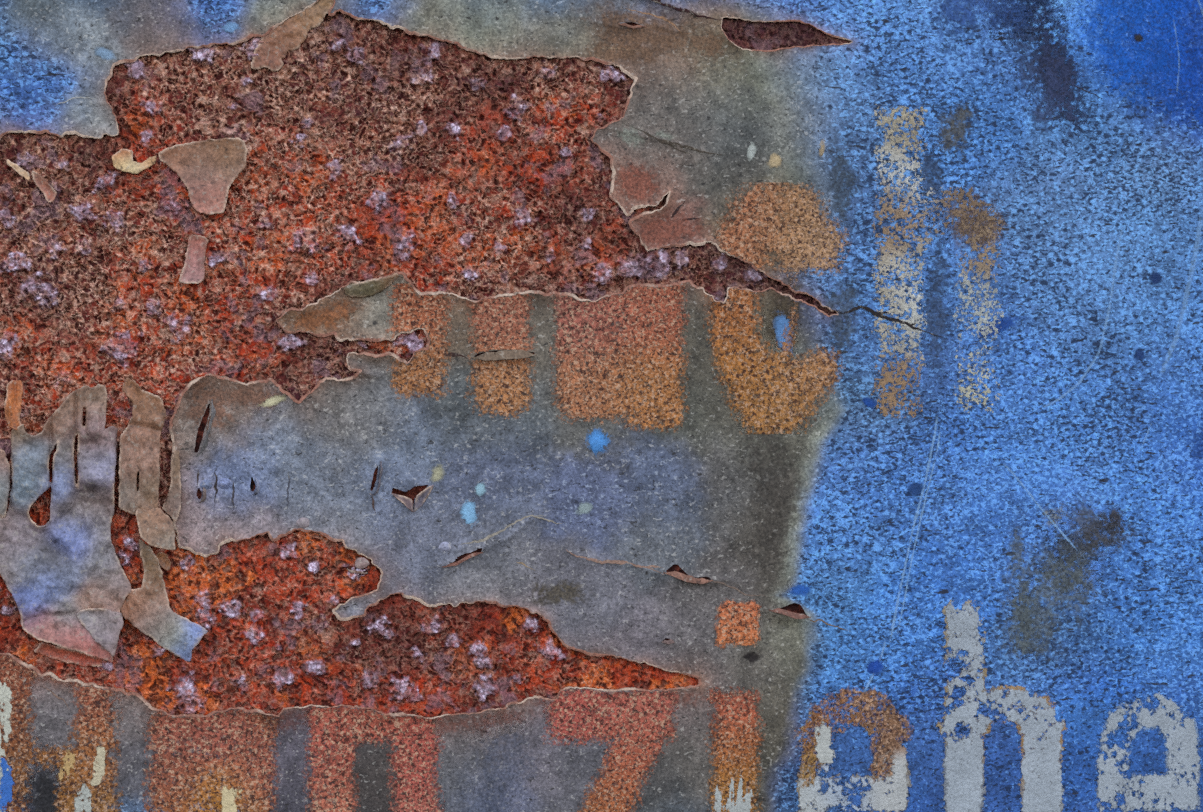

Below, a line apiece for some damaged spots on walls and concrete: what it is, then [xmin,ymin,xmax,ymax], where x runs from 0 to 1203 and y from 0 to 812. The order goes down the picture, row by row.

peeling [251,0,334,71]
crack [830,306,946,339]
corrosion [0,0,856,719]